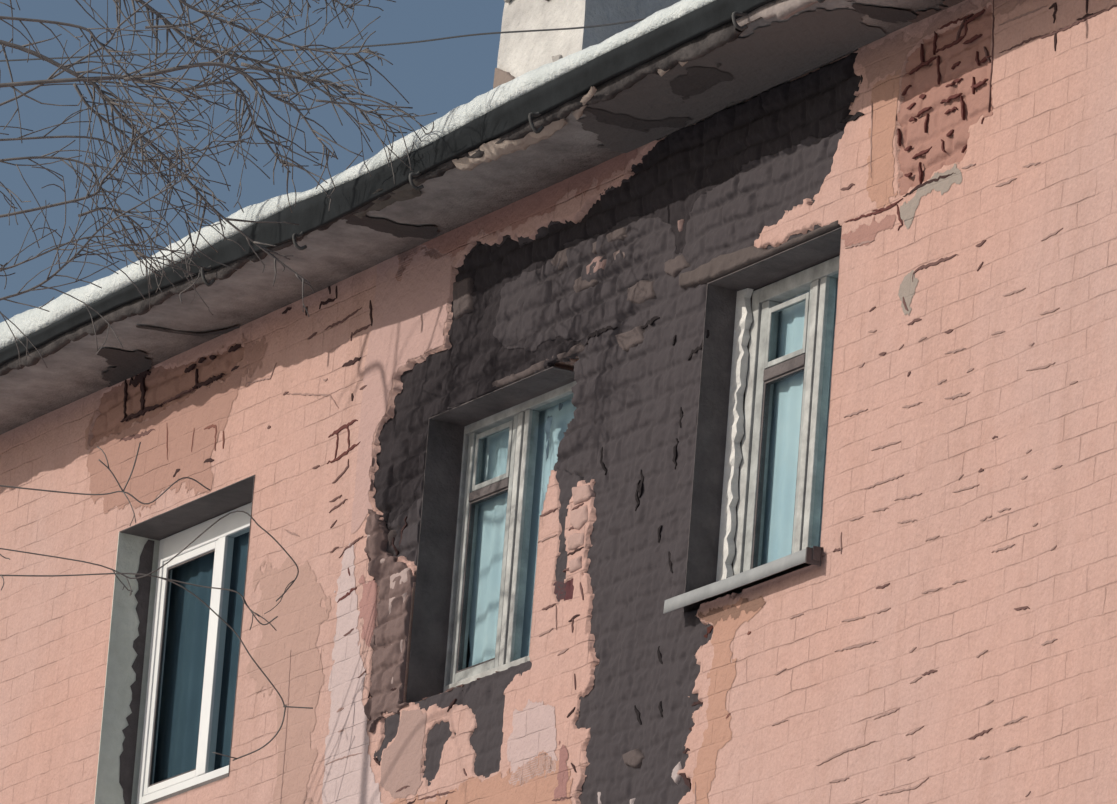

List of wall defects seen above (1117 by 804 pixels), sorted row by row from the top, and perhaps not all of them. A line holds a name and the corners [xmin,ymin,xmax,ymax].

spalling [897,5,994,231]
crack [988,0,1117,112]
spalling [90,343,244,447]
spalling [322,53,863,804]